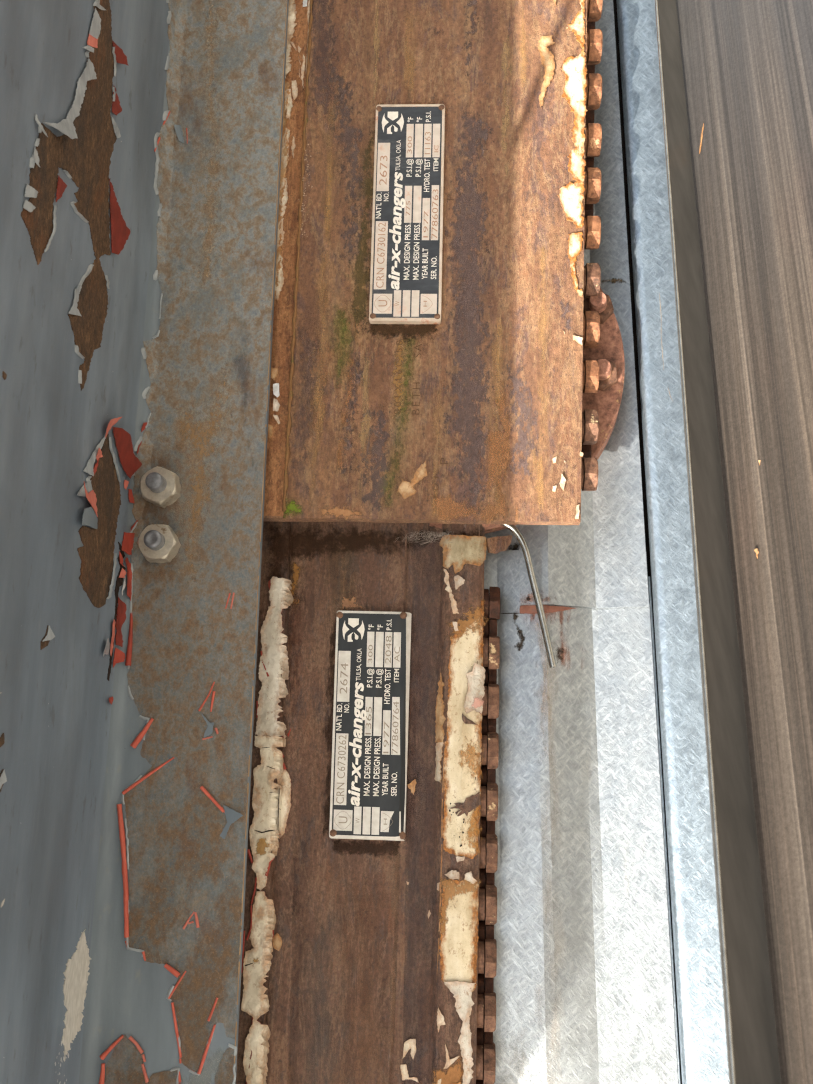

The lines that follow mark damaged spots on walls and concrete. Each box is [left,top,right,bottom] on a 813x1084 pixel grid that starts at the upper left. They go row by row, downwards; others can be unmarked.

peeling [21,0,130,390]
peeling [77,0,310,1084]
corrosion [308,0,372,263]
corrosion [317,361,399,520]
peeling [439,535,487,631]
corrosion [416,101,544,529]
peeling [537,0,588,297]
corrosion [442,599,488,859]
peeling [400,1039,419,1083]
corrosion [432,1056,464,1084]
peeling [437,980,476,1084]
corrosion [439,879,481,992]